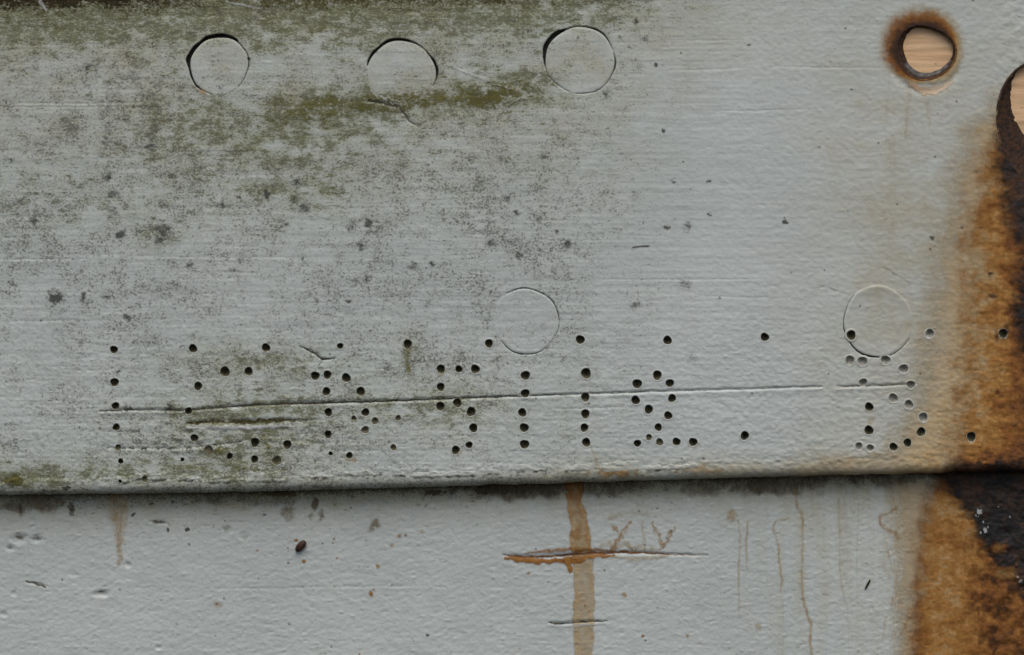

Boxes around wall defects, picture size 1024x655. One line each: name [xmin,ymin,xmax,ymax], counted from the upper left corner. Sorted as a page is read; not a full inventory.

rust [884,10,962,96]
rust [801,104,1024,655]
water stain [425,484,565,501]
rust [565,472,595,655]
crack [504,548,683,573]